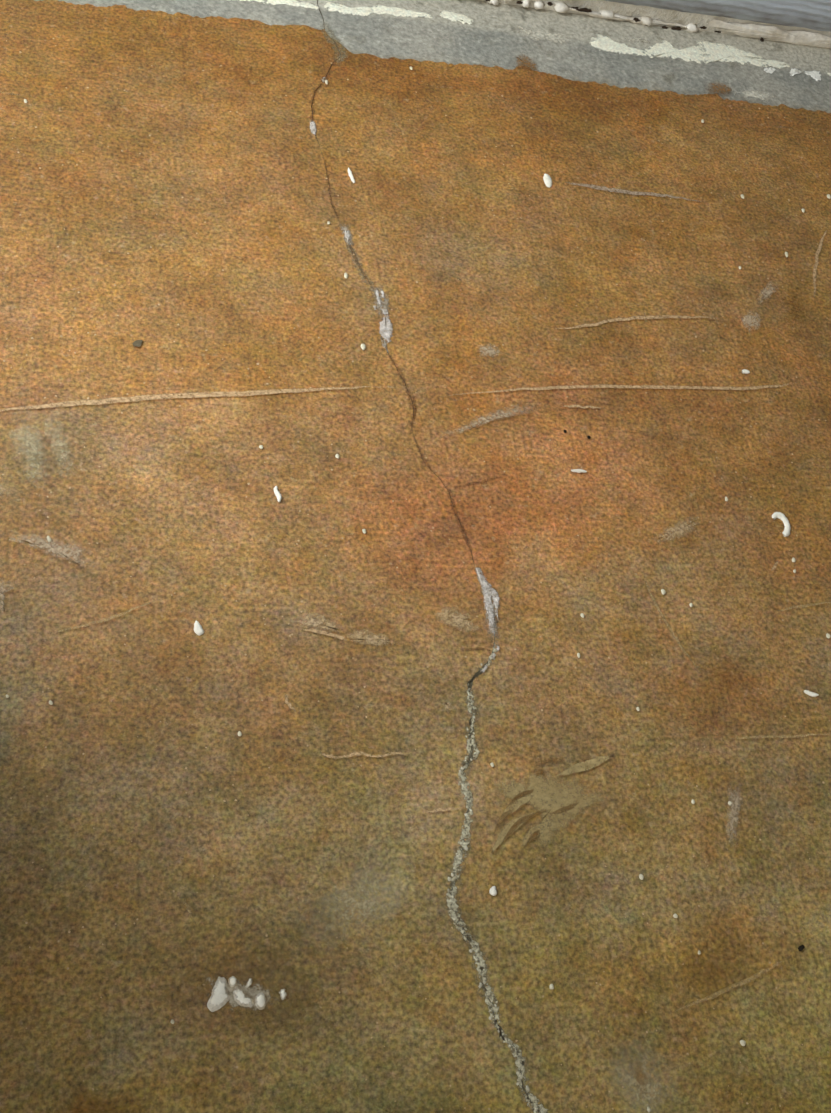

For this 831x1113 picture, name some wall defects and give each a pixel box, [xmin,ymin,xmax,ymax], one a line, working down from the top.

crack [311,0,476,570]
crack [446,628,548,1113]